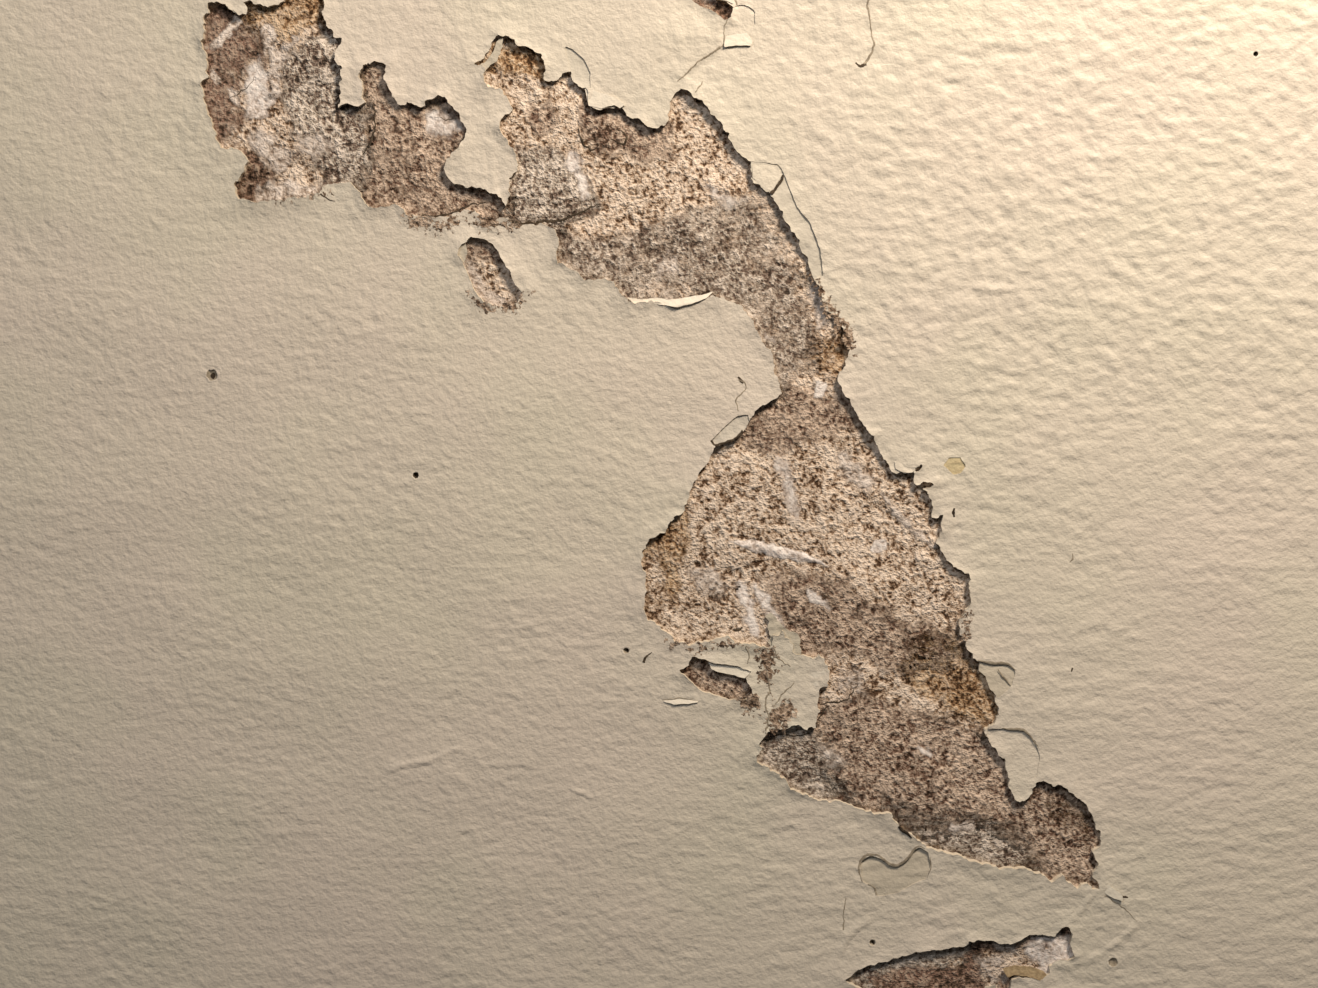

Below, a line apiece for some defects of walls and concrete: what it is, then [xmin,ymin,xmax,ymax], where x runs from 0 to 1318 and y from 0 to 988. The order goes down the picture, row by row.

peeling [202,0,1123,901]
peeling [846,927,1073,988]